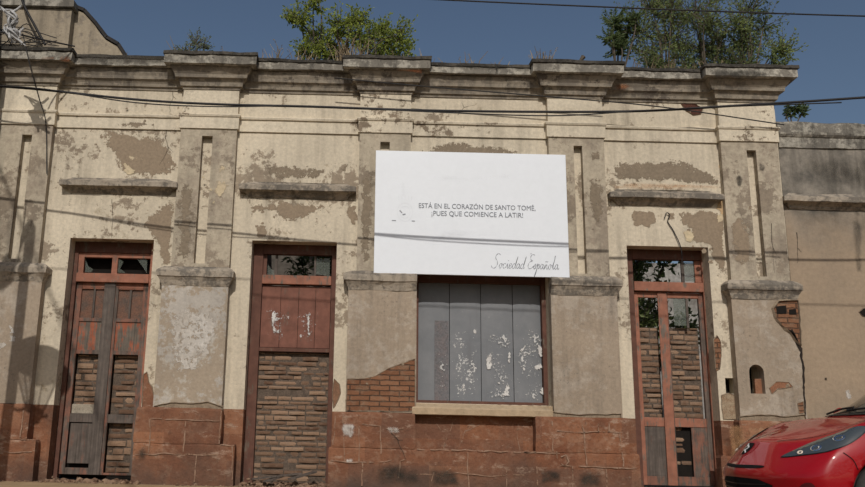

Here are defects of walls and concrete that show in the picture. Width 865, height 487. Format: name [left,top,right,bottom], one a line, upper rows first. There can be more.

peeling [94,119,178,177]
peeling [268,165,325,179]
peeling [614,159,721,185]
peeling [137,184,194,265]
peeling [632,210,656,227]
peeling [668,201,753,269]
peeling [267,310,316,339]
spalling [771,299,802,346]
spalling [332,358,416,412]
peeling [454,329,543,400]